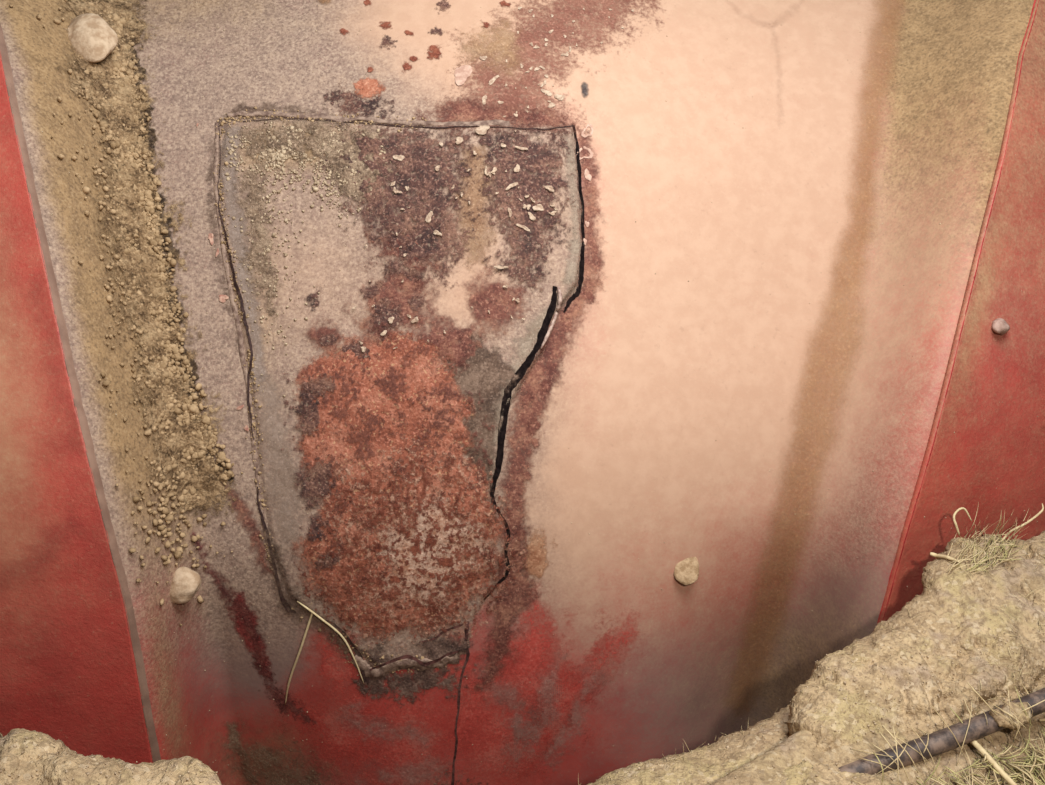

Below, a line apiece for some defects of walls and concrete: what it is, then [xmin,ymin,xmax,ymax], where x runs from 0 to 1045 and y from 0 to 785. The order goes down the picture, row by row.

peeling [529,14,578,56]
peeling [454,56,487,85]
peeling [482,64,565,117]
peeling [577,123,594,181]
peeling [485,164,558,231]
crack [207,103,585,600]
rust [217,0,659,704]
rust [192,532,316,723]
crack [257,486,470,785]